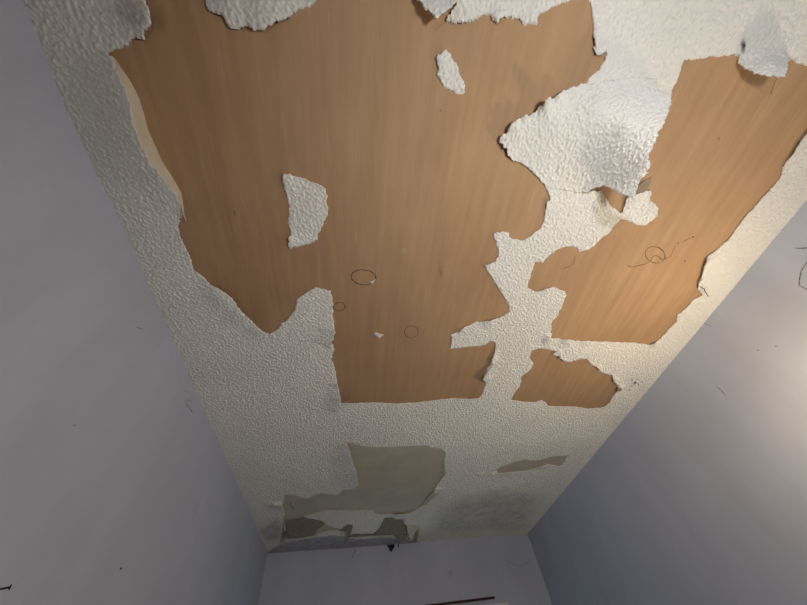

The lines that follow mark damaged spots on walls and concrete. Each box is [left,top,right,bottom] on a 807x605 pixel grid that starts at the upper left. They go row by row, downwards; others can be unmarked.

peeling [23,0,807,413]
peeling [282,443,445,552]
peeling [475,456,567,476]